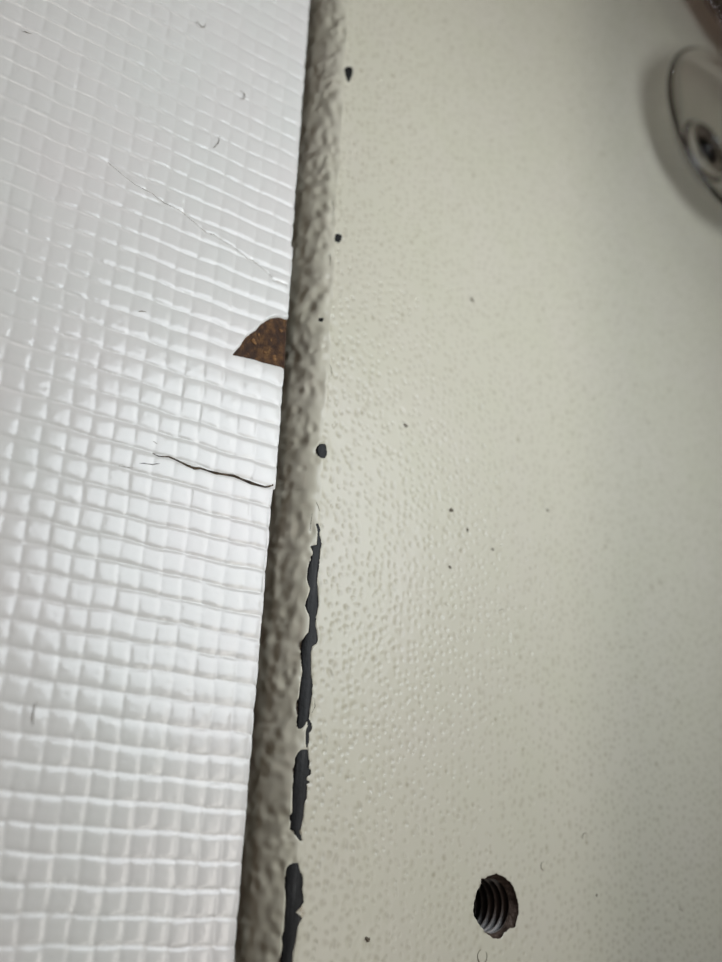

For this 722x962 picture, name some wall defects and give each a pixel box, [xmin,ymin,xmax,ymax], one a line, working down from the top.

rust [233,317,287,369]
crack [120,441,274,488]
peeling [289,523,322,841]
peeling [280,863,305,962]